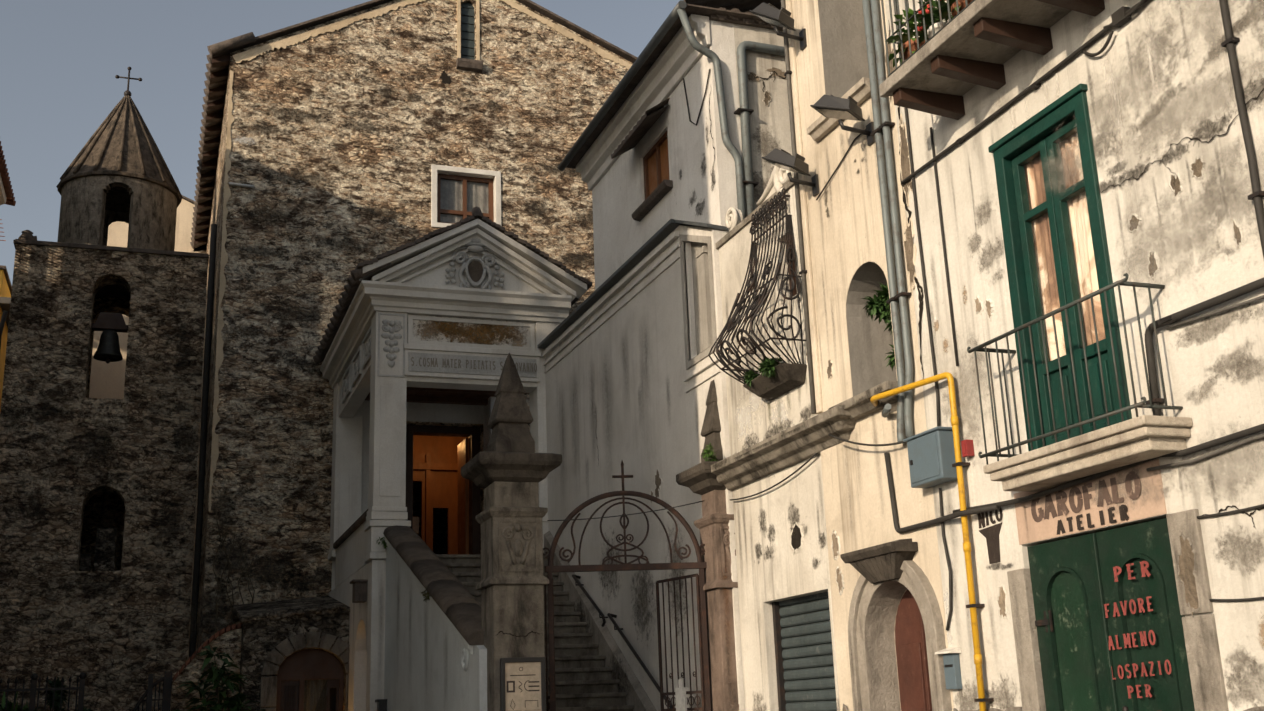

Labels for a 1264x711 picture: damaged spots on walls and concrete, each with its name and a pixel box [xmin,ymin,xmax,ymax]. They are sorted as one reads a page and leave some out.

leakage [1098,66,1230,192]
crack [1081,88,1264,202]
spalling [1168,155,1206,197]
spalling [1128,213,1142,234]
spalling [1232,219,1244,249]
spalling [1147,250,1161,281]
leakage [1178,303,1251,343]
leakage [1188,342,1264,401]
spalling [789,520,804,555]
peeling [831,529,845,596]
leakage [1216,533,1263,572]
leakage [1230,650,1255,678]